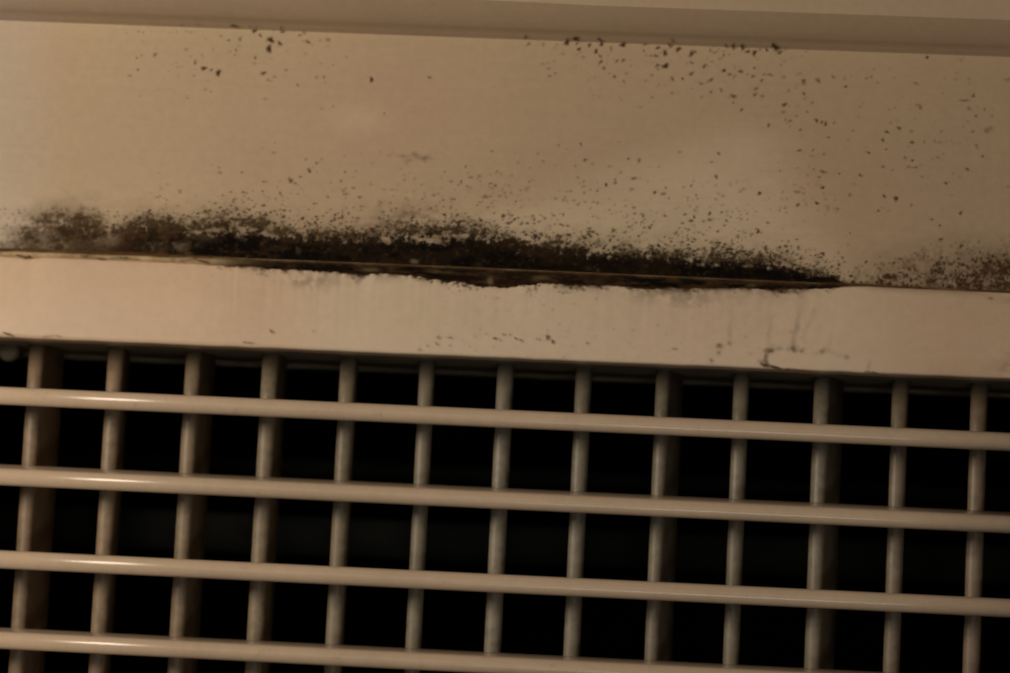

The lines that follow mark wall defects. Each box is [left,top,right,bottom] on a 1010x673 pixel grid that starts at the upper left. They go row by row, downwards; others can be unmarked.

leakage [21,205,1010,293]